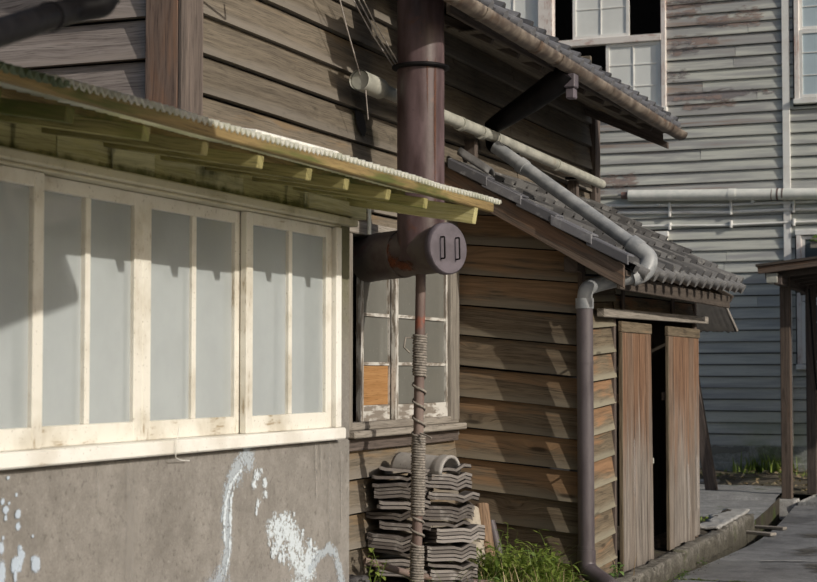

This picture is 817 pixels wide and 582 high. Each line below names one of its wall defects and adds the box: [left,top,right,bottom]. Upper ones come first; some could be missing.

peeling [666,0,764,56]
peeling [667,87,773,110]
leakage [1,493,21,530]
leakage [207,448,267,582]
leakage [0,536,40,582]
leakage [265,511,345,582]